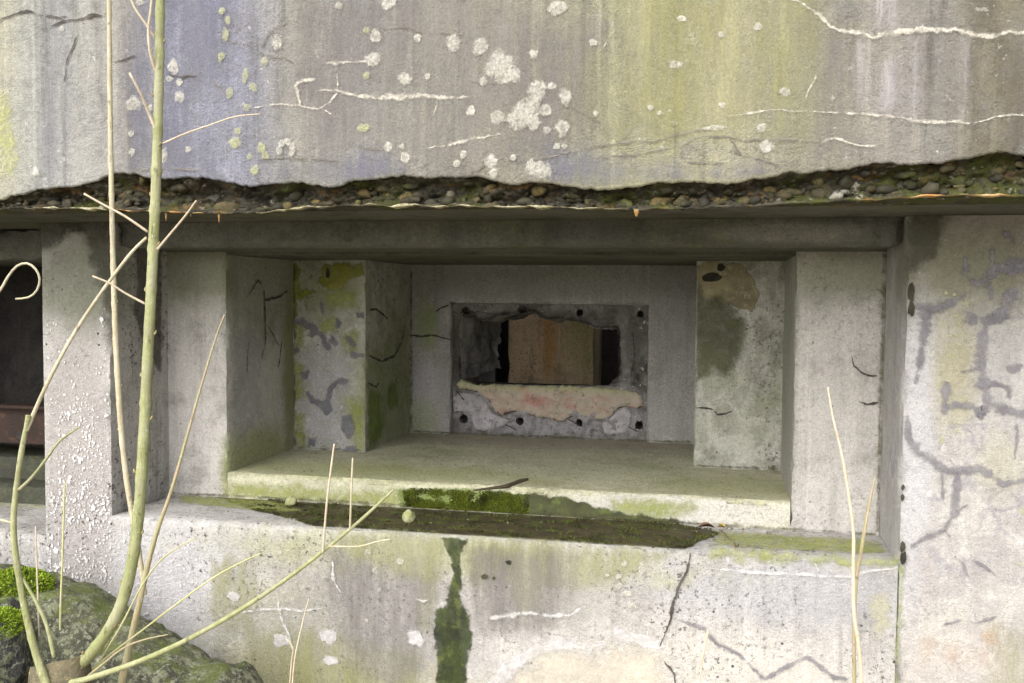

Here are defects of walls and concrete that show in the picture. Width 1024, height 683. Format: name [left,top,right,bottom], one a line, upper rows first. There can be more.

crack [232,22,523,114]
damp [300,0,584,156]
crack [429,77,1023,176]
crack [793,0,1024,39]
spalling [0,152,1024,221]
damp [905,215,944,269]
crack [247,279,288,371]
flaking render [453,306,643,435]
damp [696,287,745,378]
crack [720,232,1024,683]
damp [181,484,898,683]
crack [660,553,847,683]